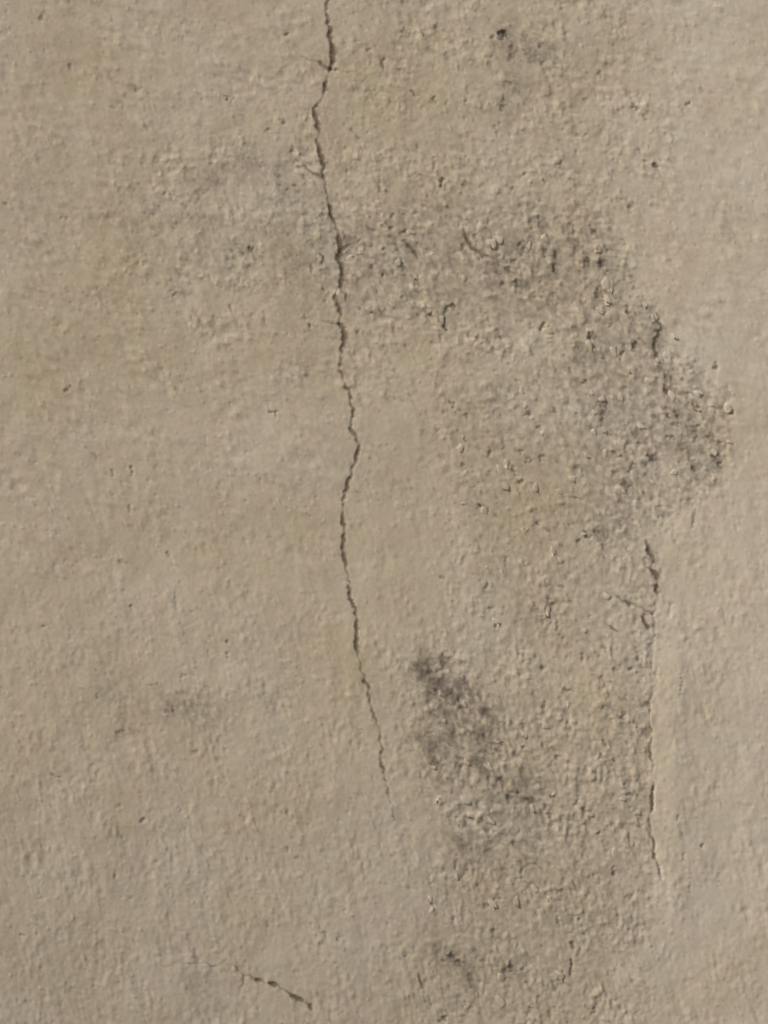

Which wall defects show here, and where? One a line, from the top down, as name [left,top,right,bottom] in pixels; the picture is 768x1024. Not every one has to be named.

crack [313,0,336,165]
crack [329,205,347,375]
crack [341,398,359,652]